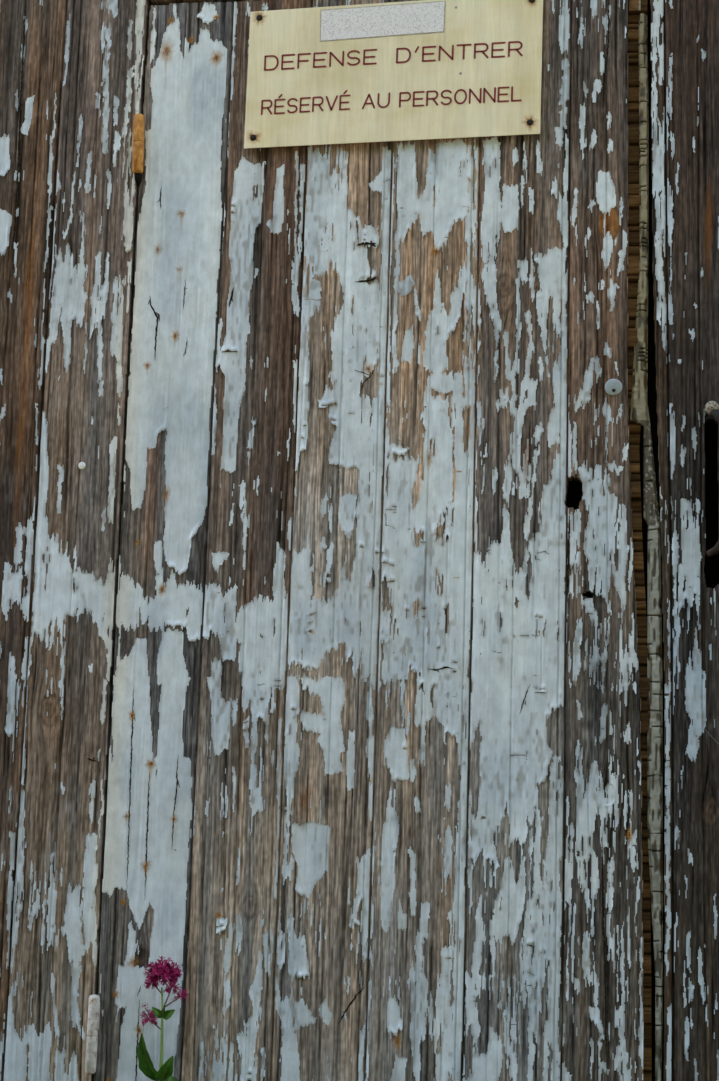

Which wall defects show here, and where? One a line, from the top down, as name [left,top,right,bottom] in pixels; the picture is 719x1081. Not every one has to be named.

peeling [0,208,20,303]
peeling [0,90,35,181]
peeling [37,93,110,396]
peeling [110,259,132,398]
peeling [113,0,146,253]
peeling [266,164,290,251]
peeling [577,170,628,329]
peeling [660,469,718,1081]
peeling [0,790,78,1081]
peeling [199,911,274,1081]
peeling [347,788,399,966]
peeling [574,703,633,1081]